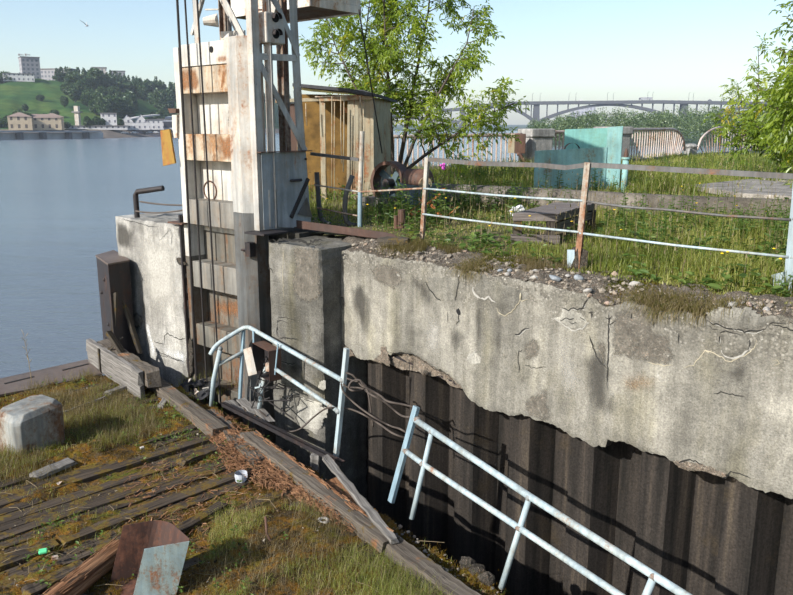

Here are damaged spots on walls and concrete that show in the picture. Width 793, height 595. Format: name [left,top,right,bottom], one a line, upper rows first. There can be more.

rust [183,71,198,90]
rust [221,138,231,157]
water stain [355,287,366,323]
spalling [373,347,462,389]
crack [515,328,546,370]
crack [563,297,615,390]
water stain [590,358,606,405]
crack [649,320,786,368]